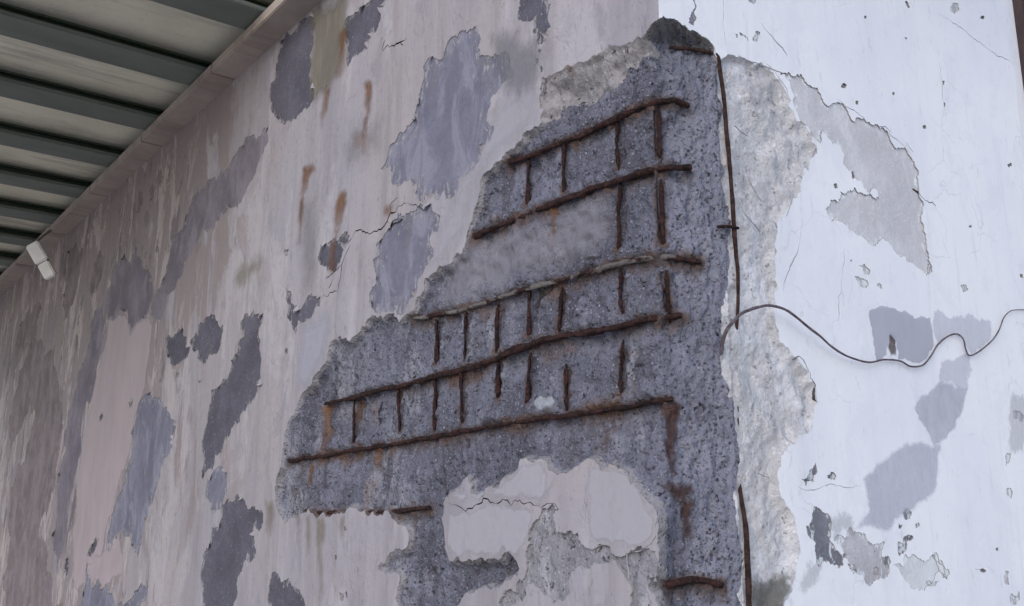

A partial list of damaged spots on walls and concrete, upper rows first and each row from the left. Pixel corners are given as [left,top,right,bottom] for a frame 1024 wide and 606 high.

rust [336,194,345,215]
crack [321,200,424,298]
peeling [2,12,315,606]
spalling [275,0,950,606]
rust [664,405,680,470]
crack [454,498,558,512]